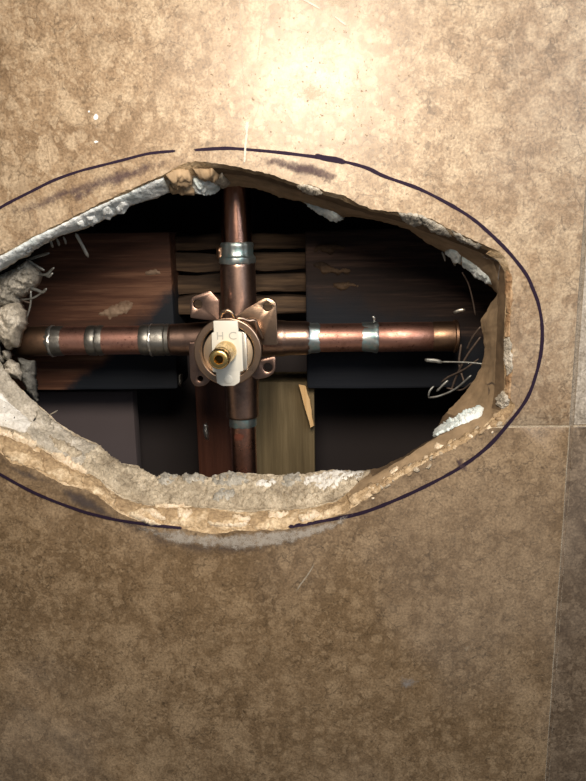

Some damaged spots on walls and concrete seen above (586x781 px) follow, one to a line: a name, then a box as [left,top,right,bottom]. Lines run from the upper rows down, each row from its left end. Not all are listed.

spalling [0,168,231,270]
flaking render [297,184,344,223]
spalling [398,212,492,285]
spalling [0,270,514,530]